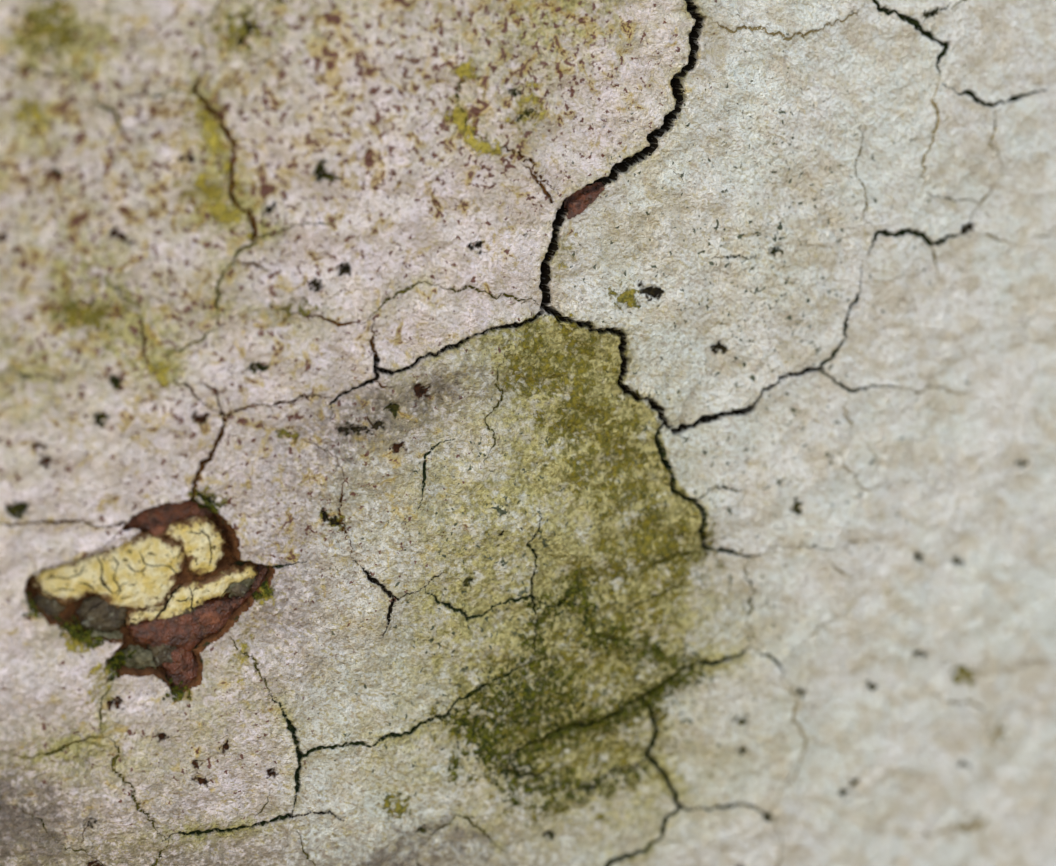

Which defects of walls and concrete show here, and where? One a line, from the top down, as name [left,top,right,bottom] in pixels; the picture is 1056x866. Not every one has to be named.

crack [0,0,332,355]
crack [456,70,488,142]
crack [583,0,1046,280]
spalling [22,494,275,701]
crack [0,146,972,866]